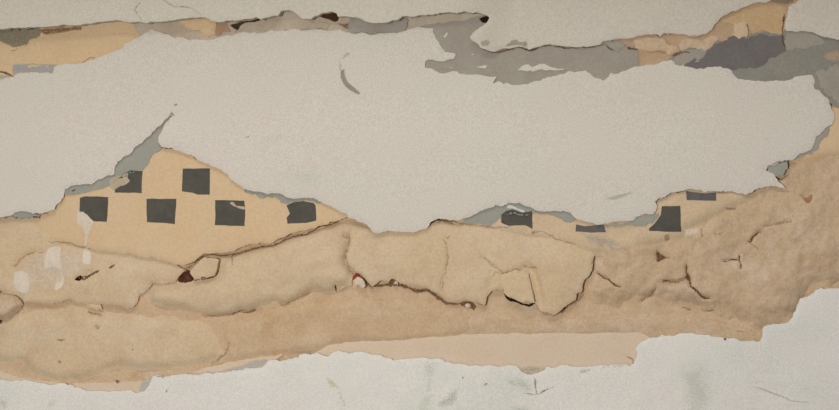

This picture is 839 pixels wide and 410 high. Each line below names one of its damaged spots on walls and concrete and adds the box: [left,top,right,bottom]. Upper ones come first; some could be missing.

flaking render [0,21,139,80]
peeling [133,0,839,165]
crack [188,219,509,306]
flaking render [0,118,839,393]
crack [504,291,584,316]
crack [642,229,723,311]
crack [723,221,793,268]